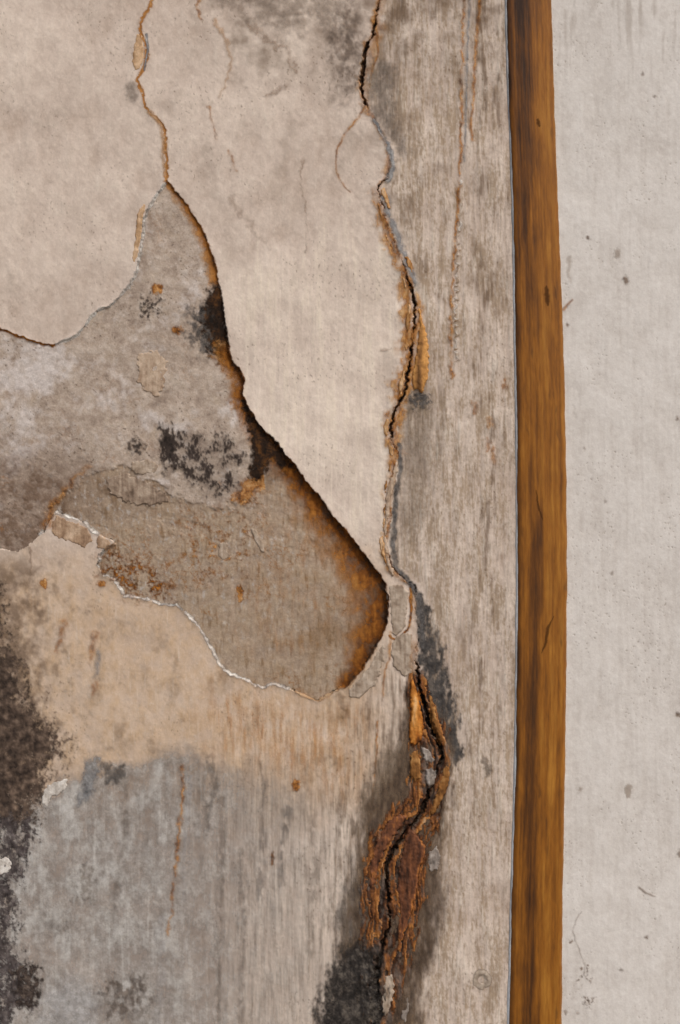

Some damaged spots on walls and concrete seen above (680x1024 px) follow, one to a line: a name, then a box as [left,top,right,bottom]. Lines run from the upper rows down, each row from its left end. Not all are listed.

crack [132,0,169,182]
spalling [0,183,371,701]
leakage [158,400,294,497]
crack [336,0,444,1006]
leakage [0,583,227,1024]
leakage [312,593,464,1024]